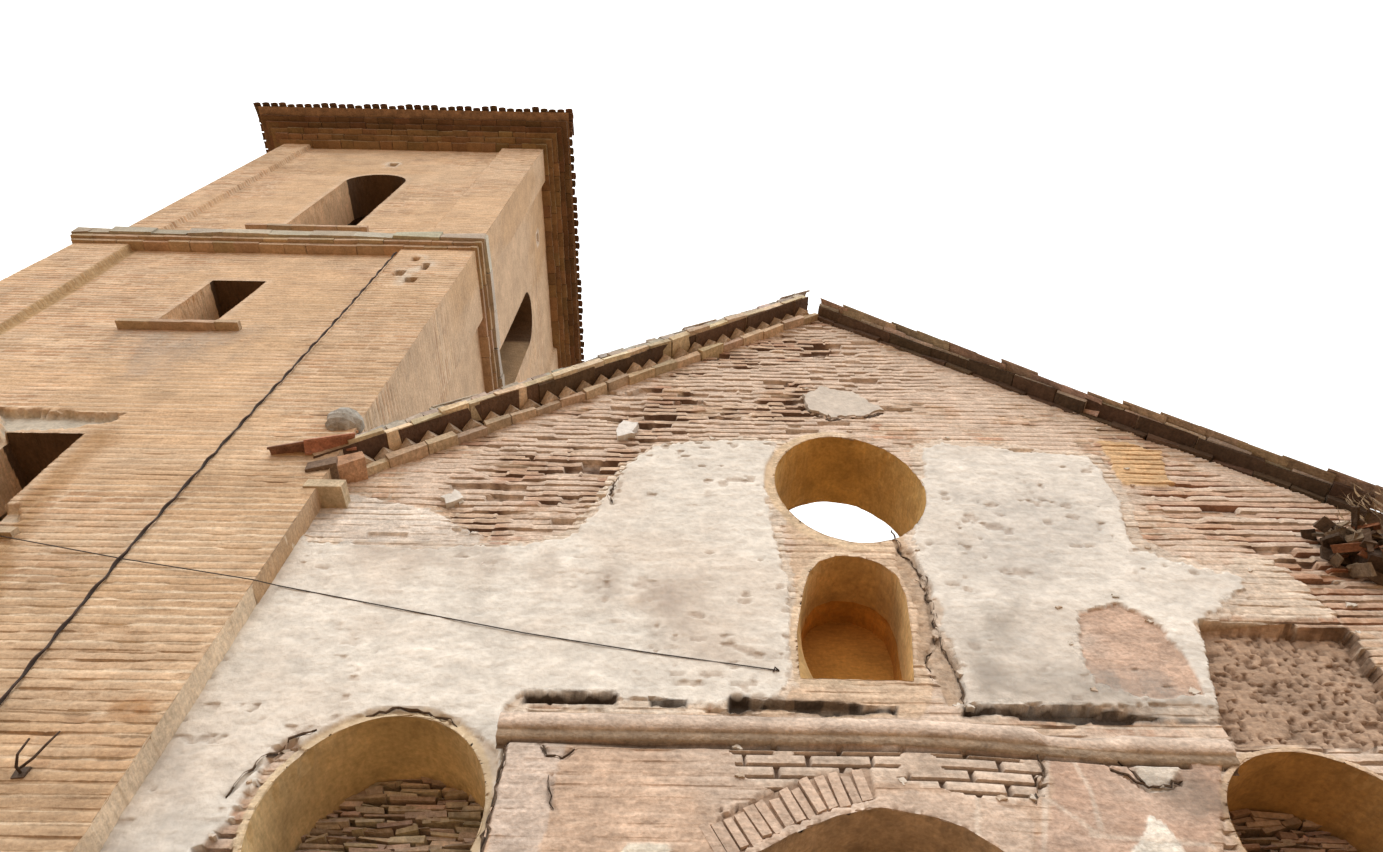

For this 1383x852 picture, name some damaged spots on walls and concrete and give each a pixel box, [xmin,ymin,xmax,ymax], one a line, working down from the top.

spalling [367,321,1383,776]
crack [890,530,964,705]
spalling [198,745,306,852]
spalling [731,744,1045,804]